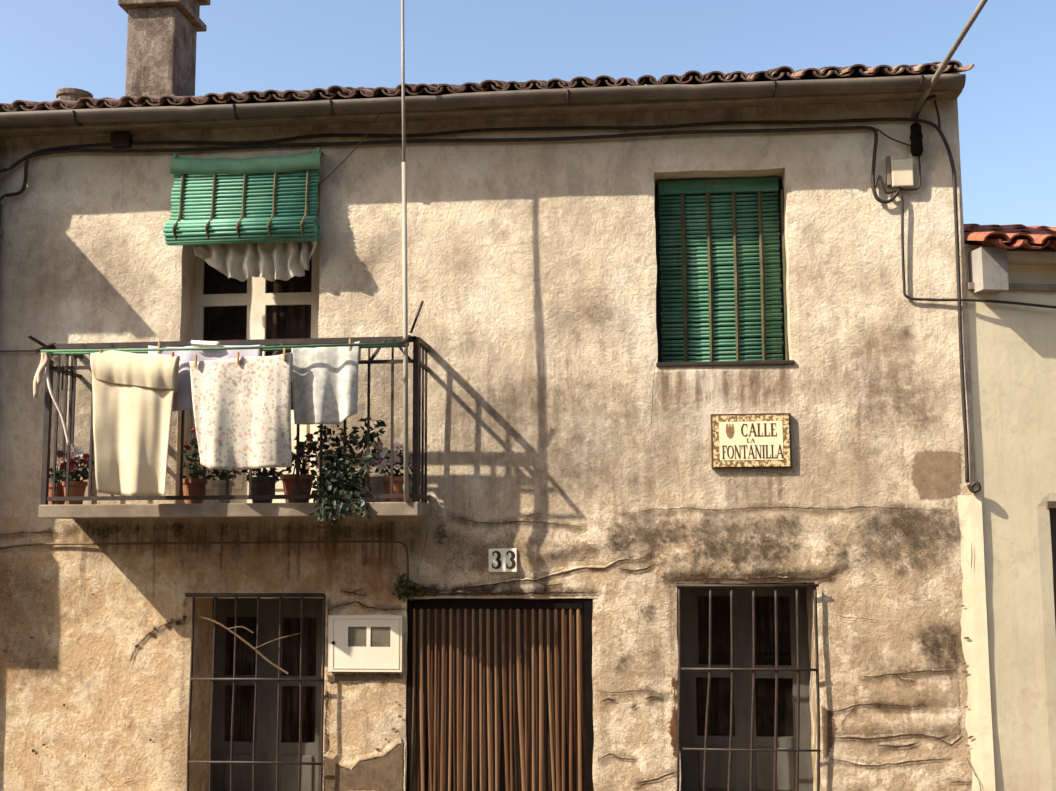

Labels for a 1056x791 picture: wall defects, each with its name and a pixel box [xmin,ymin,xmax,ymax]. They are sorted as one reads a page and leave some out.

spalling [911,449,962,500]
crack [327,511,832,610]
water stain [608,516,809,580]
water stain [827,512,956,575]
crack [128,615,187,668]
water stain [922,626,960,669]
spalling [323,672,406,791]
crack [598,688,668,708]
crack [832,668,981,791]
crack [597,751,677,791]